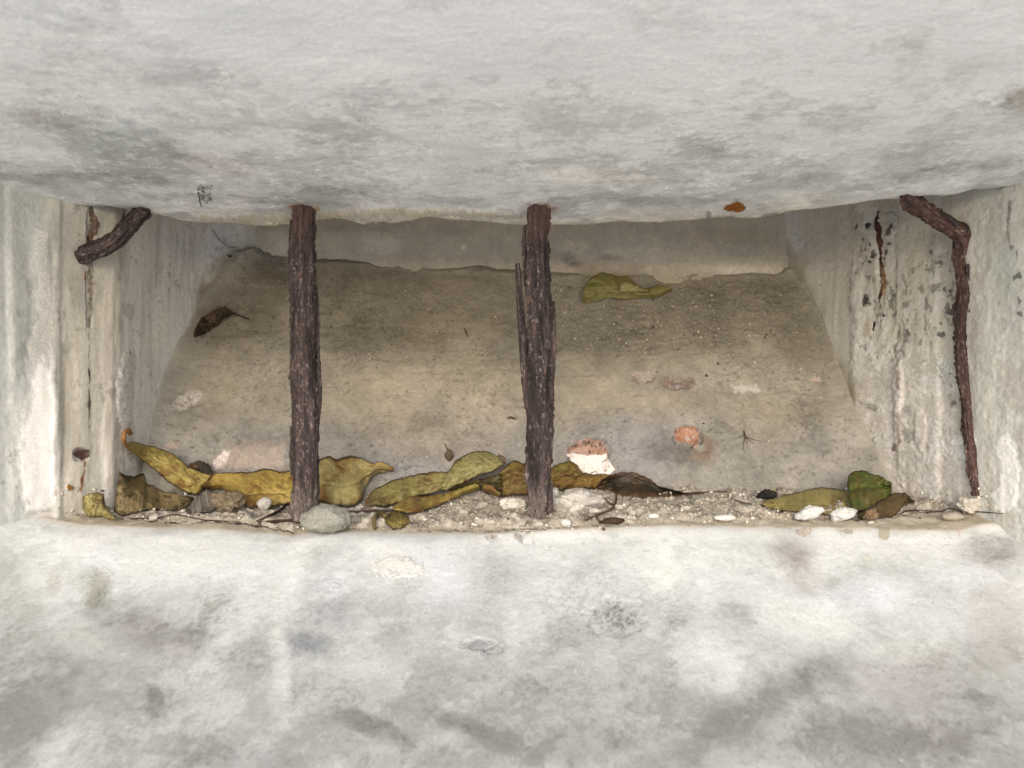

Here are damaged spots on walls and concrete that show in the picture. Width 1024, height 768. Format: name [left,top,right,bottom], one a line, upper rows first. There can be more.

corrosion [711,197,758,216]
crack [84,206,101,433]
spalling [562,437,616,475]
spalling [671,424,700,451]